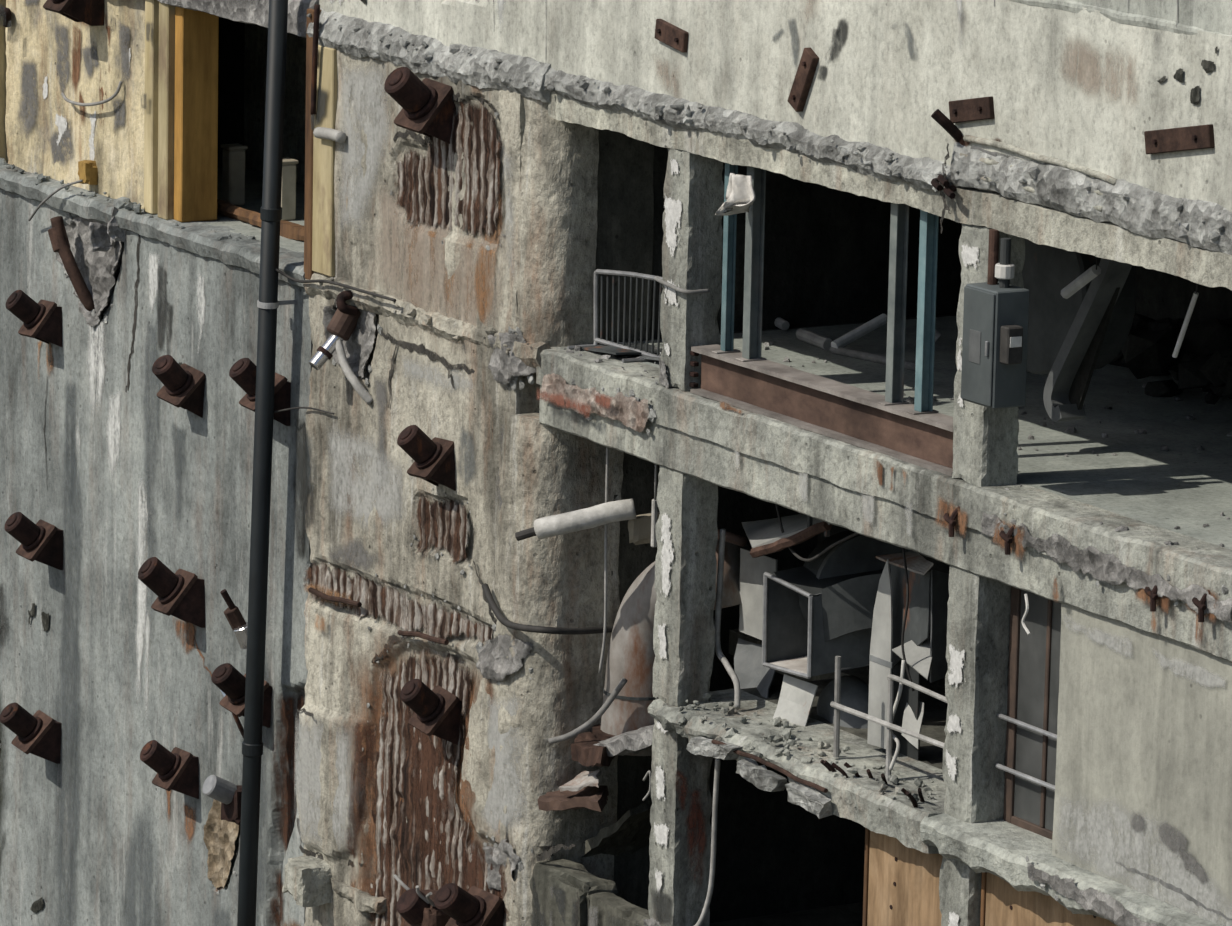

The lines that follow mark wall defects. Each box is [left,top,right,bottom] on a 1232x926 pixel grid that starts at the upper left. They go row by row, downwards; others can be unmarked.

spalling [389,100,505,251]
spalling [55,212,124,327]
corrosion [380,194,501,326]
peeling [663,196,682,256]
crack [377,330,475,408]
spalling [488,327,656,436]
spalling [410,488,471,575]
peeling [660,513,674,598]
peeling [948,644,966,688]
spalling [303,560,533,926]
spalling [820,760,925,808]
spalling [203,799,239,895]